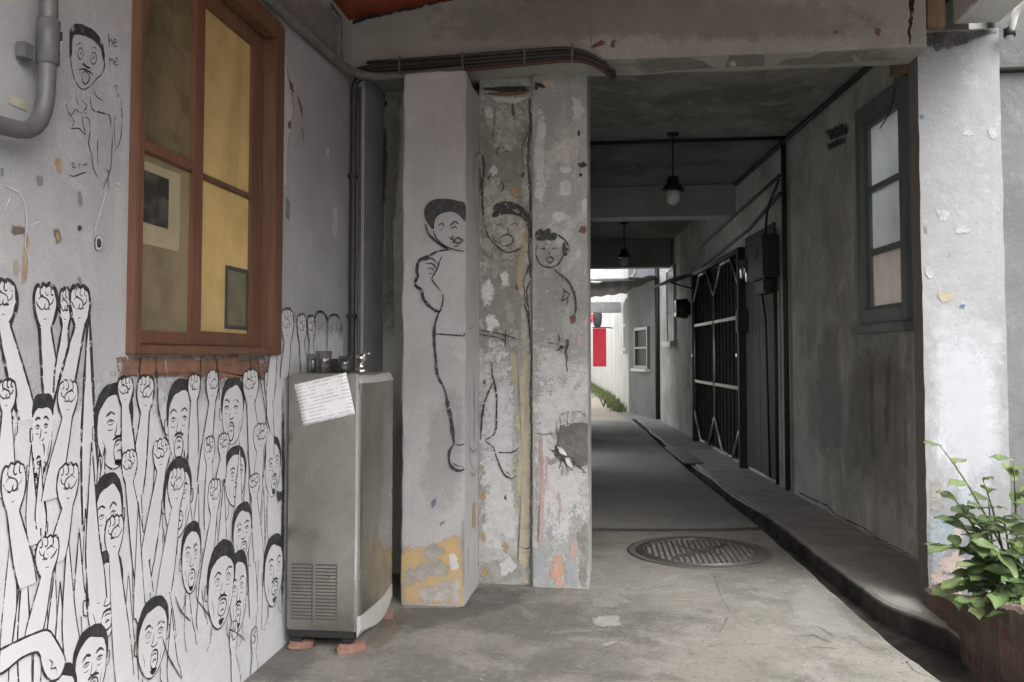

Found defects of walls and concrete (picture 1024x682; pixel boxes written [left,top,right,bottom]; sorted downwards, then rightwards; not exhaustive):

crack [907,0,915,45]
peeling [401,78,588,606]